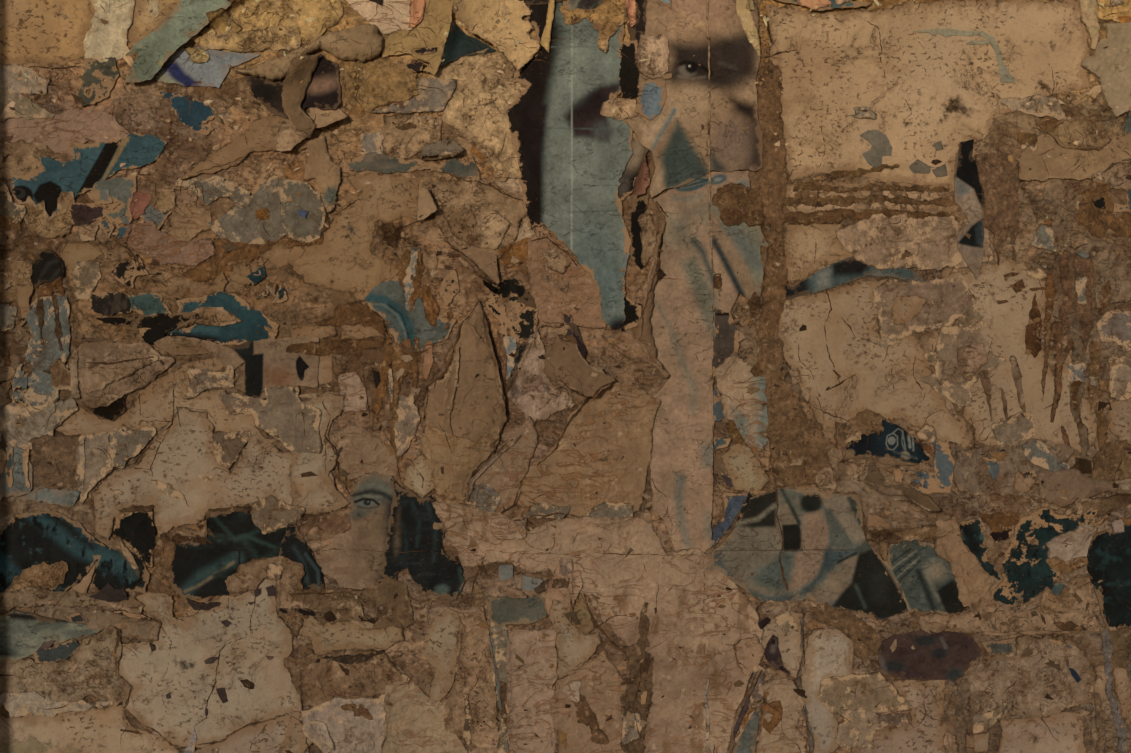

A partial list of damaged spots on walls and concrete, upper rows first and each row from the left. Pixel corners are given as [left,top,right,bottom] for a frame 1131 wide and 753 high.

peeling [0,0,95,66]
peeling [451,0,555,70]
peeling [180,23,437,303]
peeling [736,0,1093,283]
peeling [423,300,510,442]
crack [798,288,855,421]
peeling [778,260,1131,453]
peeling [55,353,349,540]
peeling [721,443,769,492]
peeling [0,578,404,753]
peeling [754,606,946,753]
peeling [999,711,1086,753]